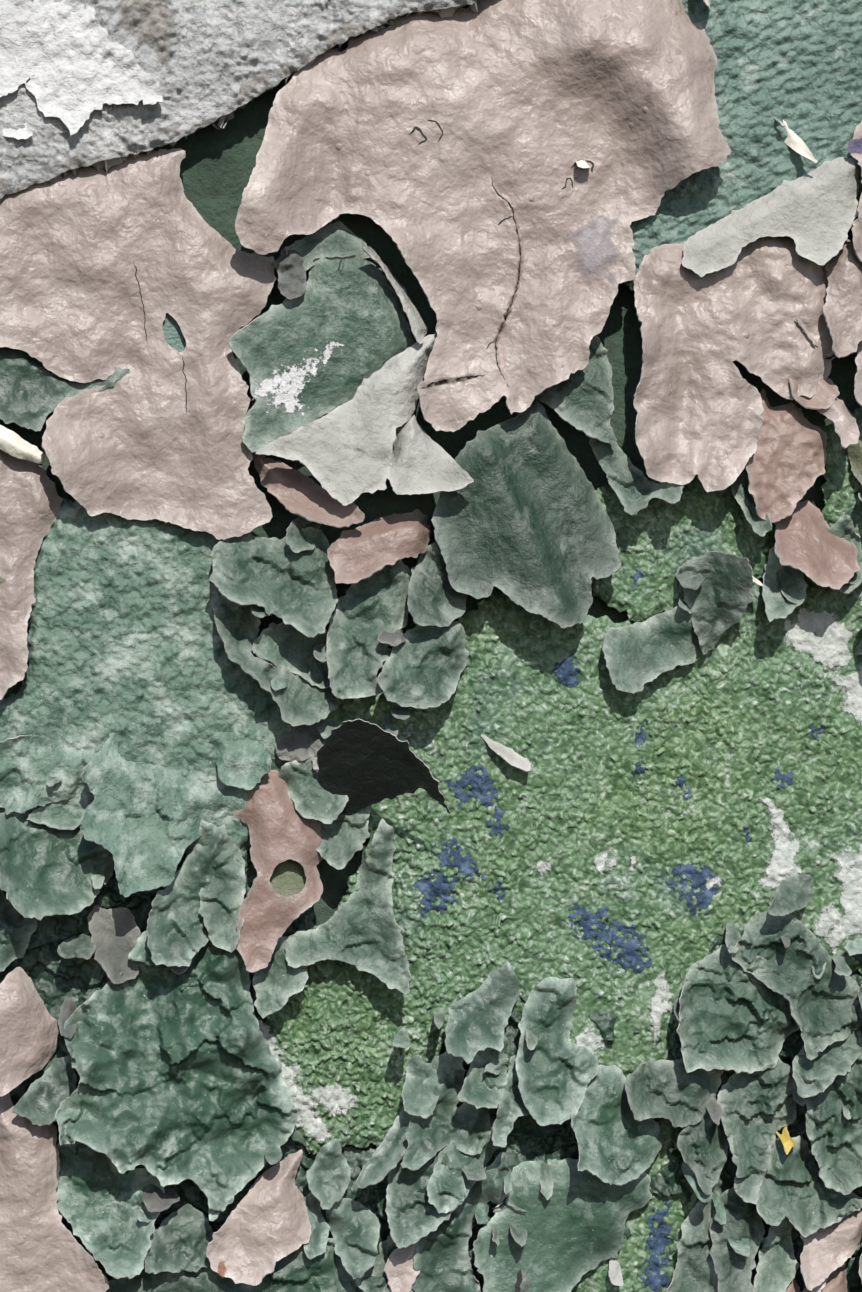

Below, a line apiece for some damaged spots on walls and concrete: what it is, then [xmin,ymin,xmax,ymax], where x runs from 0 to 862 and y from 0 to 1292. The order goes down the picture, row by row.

peeling [0,0,163,140]
peeling [0,148,469,727]
crack [422,180,521,388]
peeling [235,0,731,629]
peeling [773,118,818,164]
peeling [852,121,862,140]
peeling [247,152,862,1292]
peeling [0,732,411,1292]